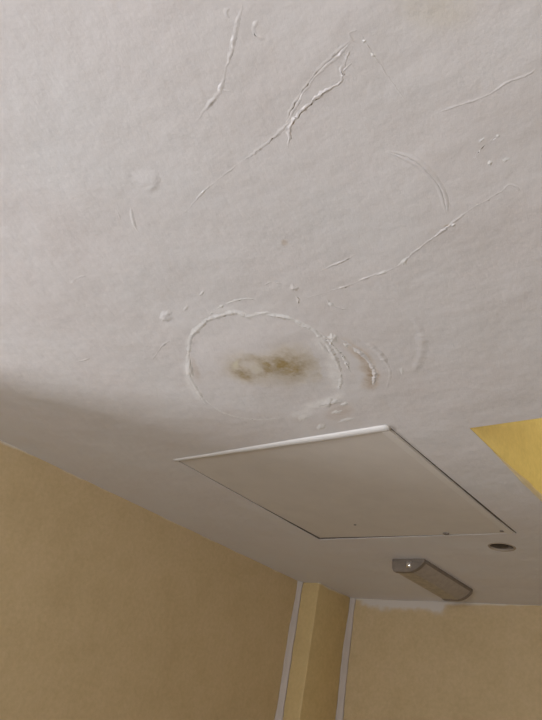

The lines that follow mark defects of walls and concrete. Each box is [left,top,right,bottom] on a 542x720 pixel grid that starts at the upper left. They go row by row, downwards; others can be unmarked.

damp [212,333,326,393]